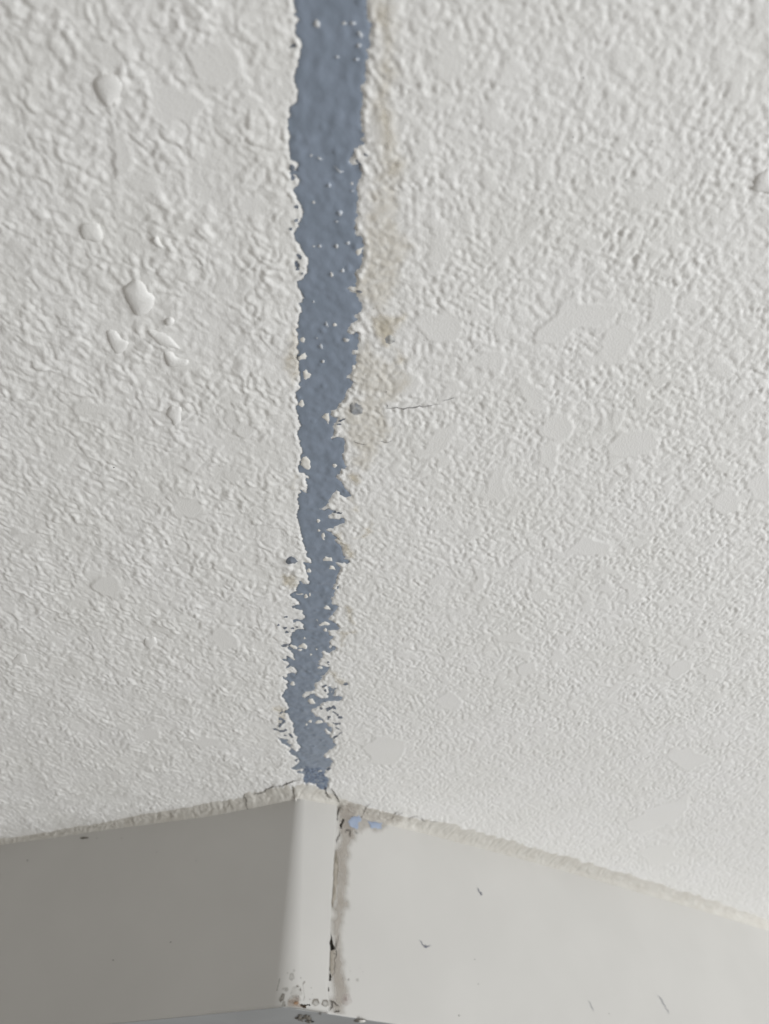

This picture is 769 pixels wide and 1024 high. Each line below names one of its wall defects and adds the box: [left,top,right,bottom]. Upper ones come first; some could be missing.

peeling [274,0,372,790]